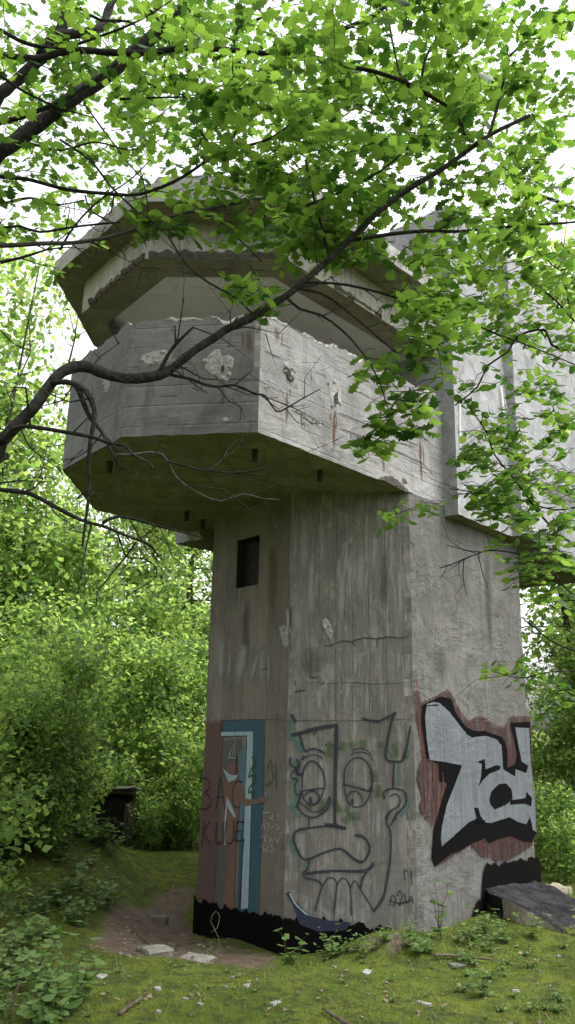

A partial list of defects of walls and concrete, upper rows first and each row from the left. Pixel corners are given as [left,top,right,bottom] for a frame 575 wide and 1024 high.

spalling [269,317,365,363]
spalling [140,350,172,366]
spalling [202,349,234,383]
spalling [322,618,332,639]
crack [326,636,409,646]